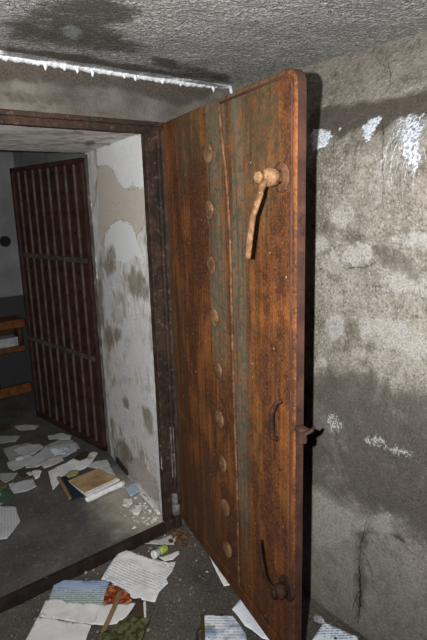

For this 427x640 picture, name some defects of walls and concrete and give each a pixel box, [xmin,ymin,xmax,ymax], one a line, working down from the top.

water stain [0,0,233,105]
water stain [309,89,427,183]
peeling [96,135,145,324]
water stain [303,368,427,539]
crack [353,520,373,623]